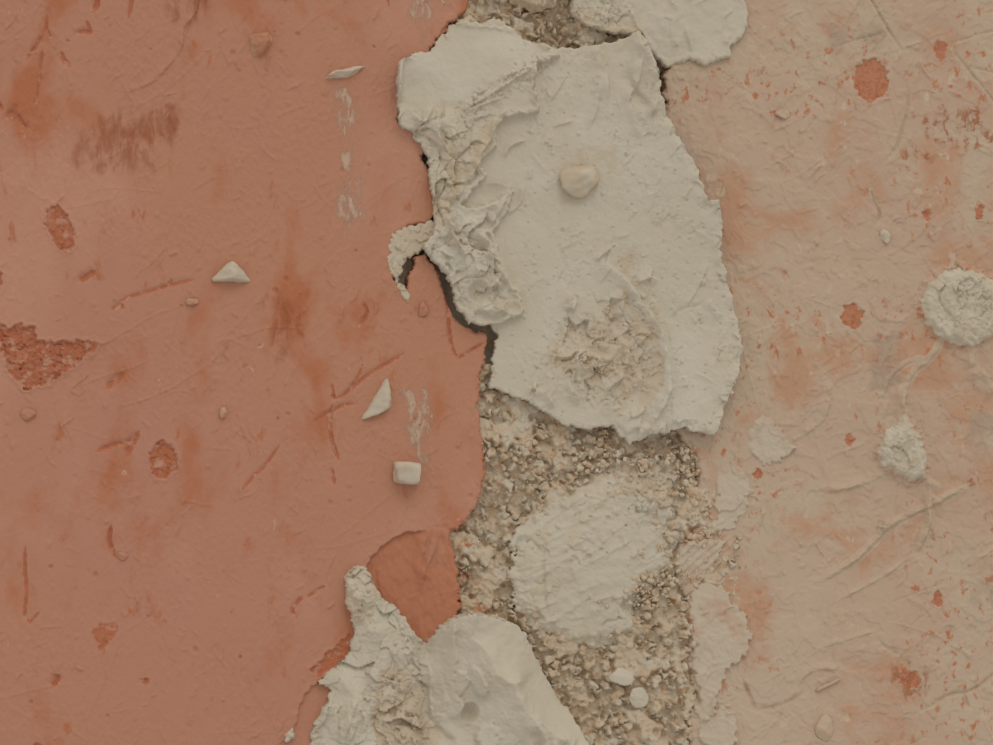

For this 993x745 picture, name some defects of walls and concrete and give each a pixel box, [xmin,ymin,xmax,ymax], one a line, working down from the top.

spalling [326,66,365,79]
spalling [852,58,889,103]
spalling [44,204,75,254]
spalling [0,323,98,391]
peeling [367,0,796,745]
spalling [362,379,392,420]
spalling [149,440,178,478]
peeling [280,634,352,745]